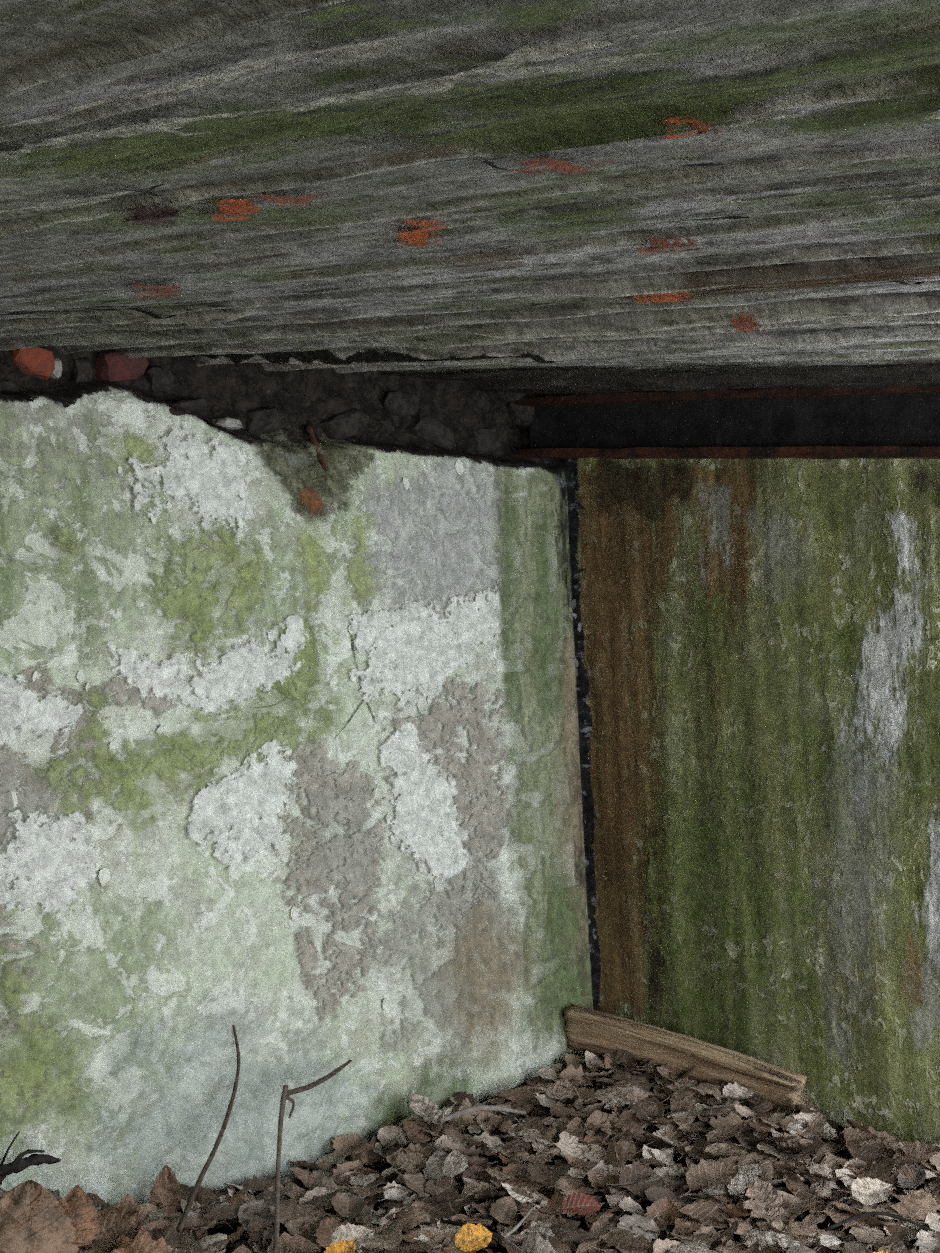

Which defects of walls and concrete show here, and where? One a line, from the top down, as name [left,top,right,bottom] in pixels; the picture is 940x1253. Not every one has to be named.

leakage [78,690,123,782]
leakage [278,620,317,730]
leakage [502,496,521,722]
leakage [535,513,593,1025]
rust [576,460,756,1020]
leakage [825,513,930,1055]
leakage [910,810,940,1047]
leakage [101,1016,360,1203]